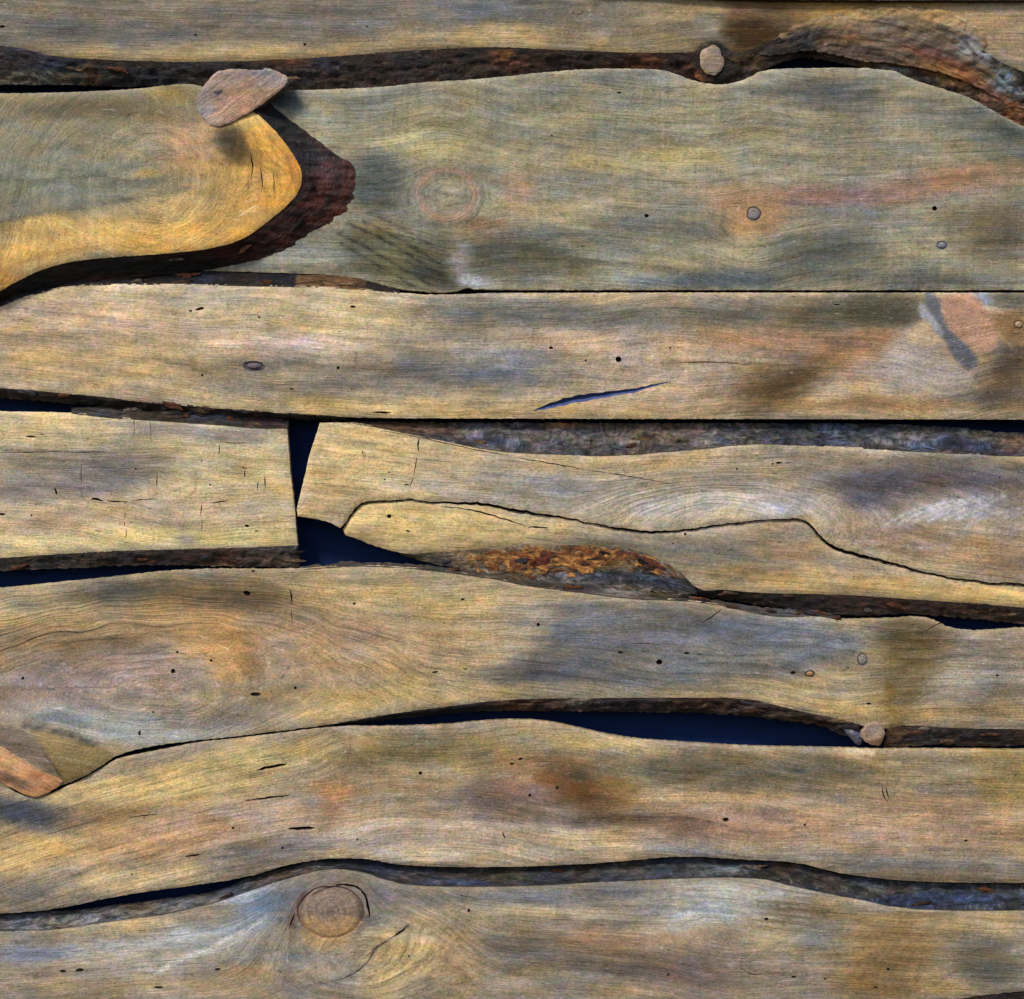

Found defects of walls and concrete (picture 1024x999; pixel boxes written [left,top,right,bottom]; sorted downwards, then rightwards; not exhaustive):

crack [534,361,747,411]
crack [343,411,1024,586]